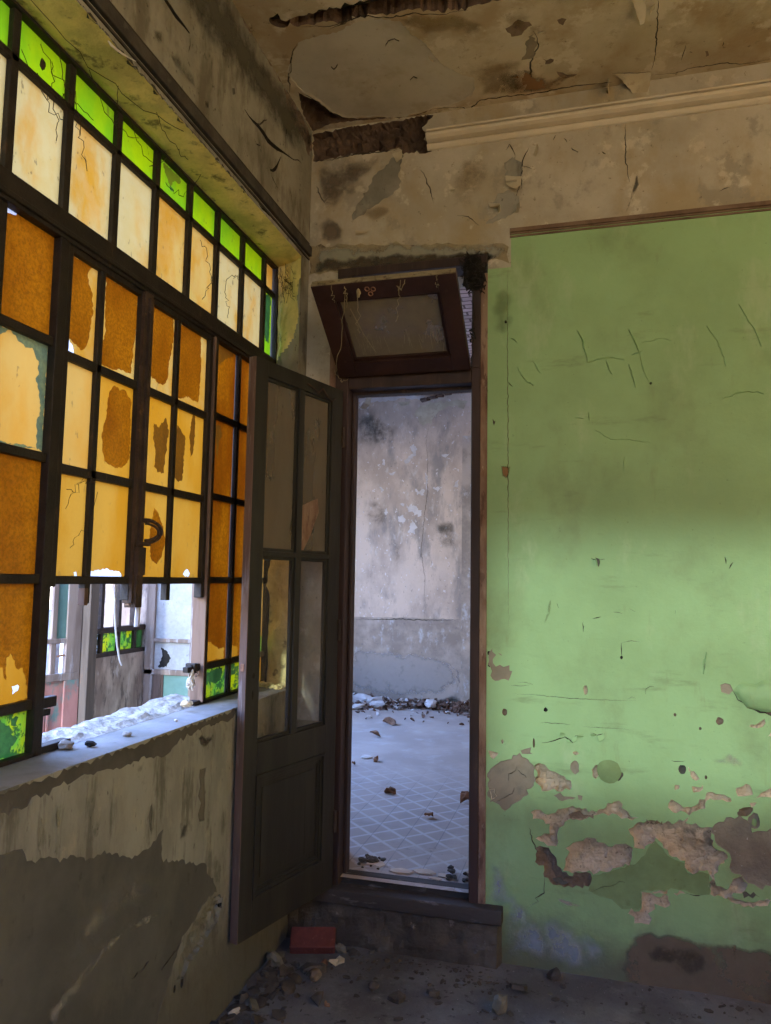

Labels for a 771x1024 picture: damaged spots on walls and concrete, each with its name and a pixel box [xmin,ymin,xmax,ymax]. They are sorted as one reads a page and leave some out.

flaking render [269,0,499,28]
crack [436,18,608,109]
flaking render [298,92,432,131]
crack [245,110,434,203]
damp [321,164,369,199]
damp [324,223,341,240]
peeling [384,473,440,534]
peeling [487,649,512,681]
spalling [42,694,195,754]
peeling [0,708,237,816]
peeling [487,732,771,925]
damp [624,933,771,1005]